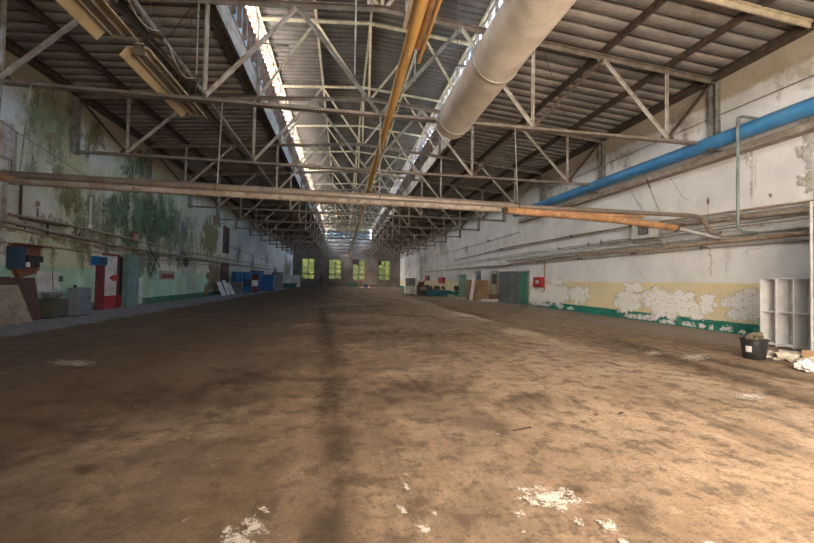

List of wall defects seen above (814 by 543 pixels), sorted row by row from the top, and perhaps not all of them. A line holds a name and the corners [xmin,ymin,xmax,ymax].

spalling [796,132,814,195]
damp [31,188,196,278]
peeling [529,279,592,310]
peeling [612,282,760,334]